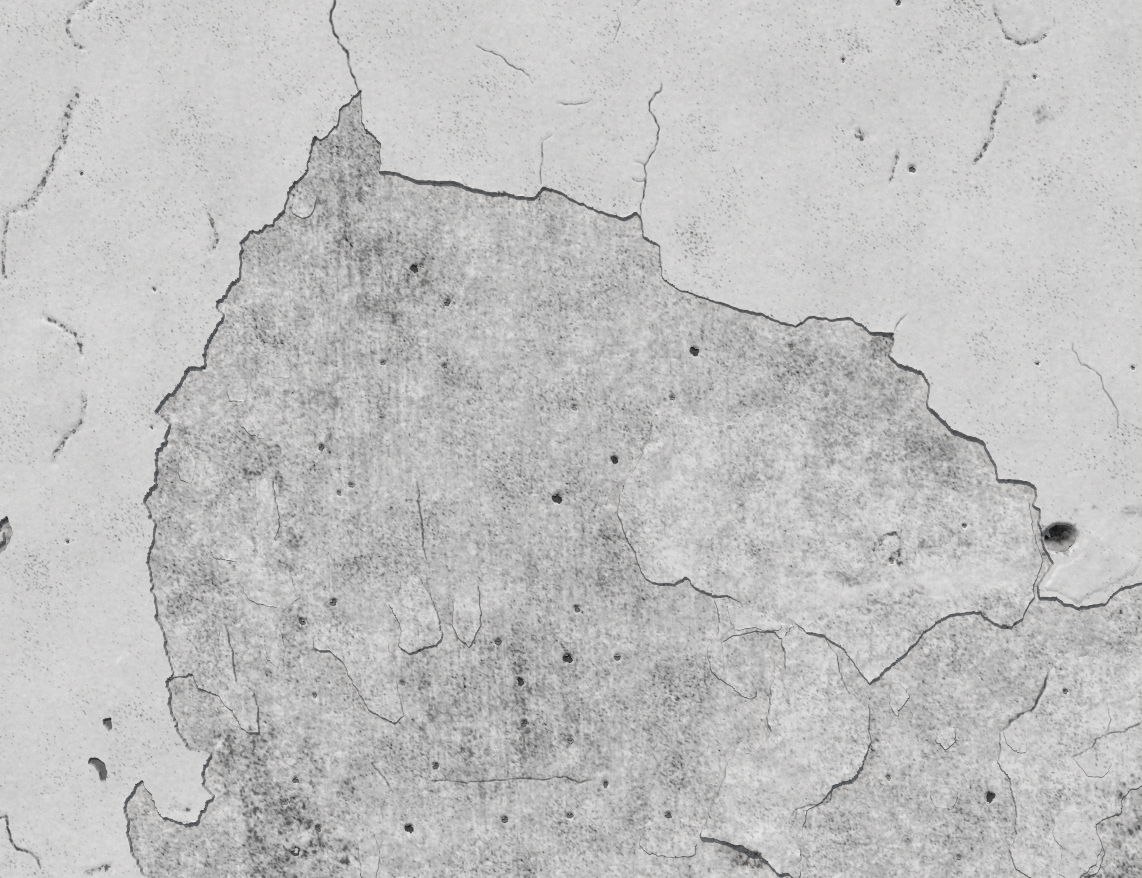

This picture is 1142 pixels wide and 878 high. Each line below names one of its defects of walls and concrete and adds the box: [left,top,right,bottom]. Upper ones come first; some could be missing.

crack [330,0,357,86]
crack [2,93,79,278]
crack [640,91,660,209]
flaking render [0,518,13,552]
flaking render [126,92,1142,878]
crack [0,815,39,863]